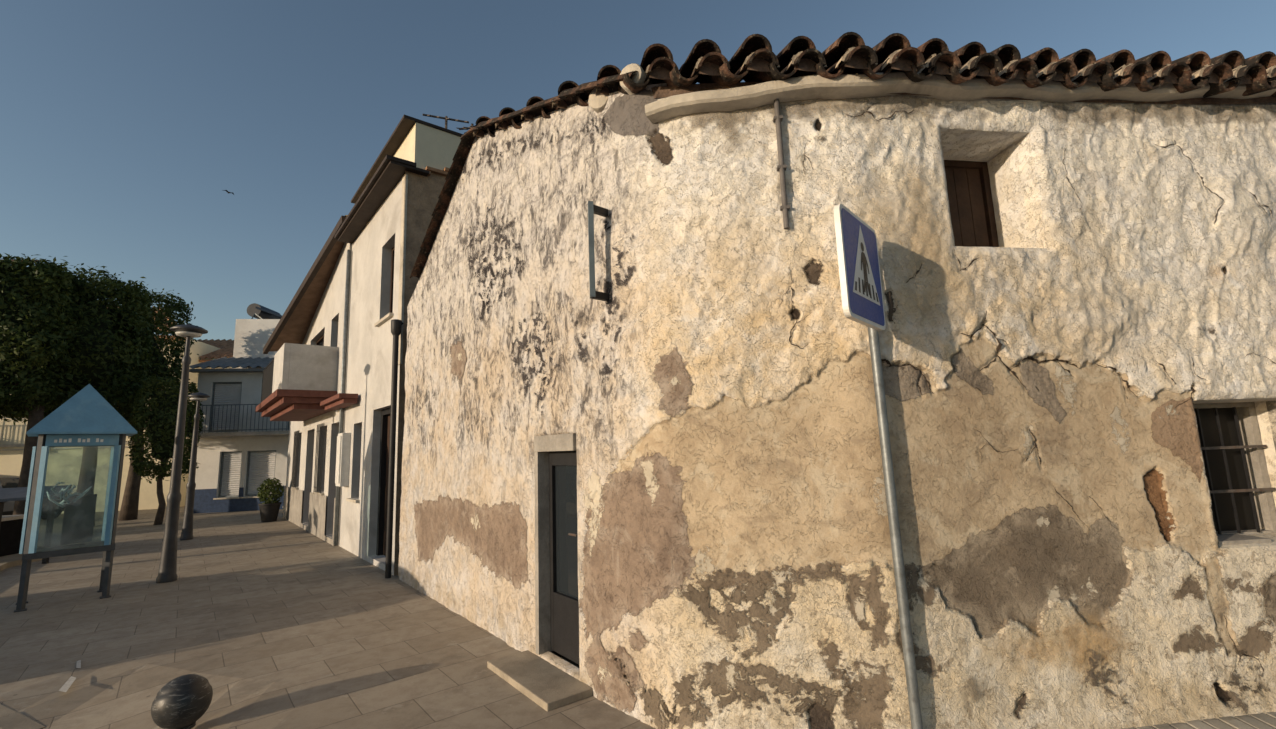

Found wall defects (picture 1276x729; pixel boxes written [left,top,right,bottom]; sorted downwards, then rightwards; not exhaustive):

water stain [461,112,605,180]
spalling [647,128,673,166]
crack [1155,140,1272,223]
water stain [463,207,524,322]
water stain [572,213,636,384]
water stain [511,304,562,416]
peeling [414,495,530,589]
peeling [579,320,1276,729]